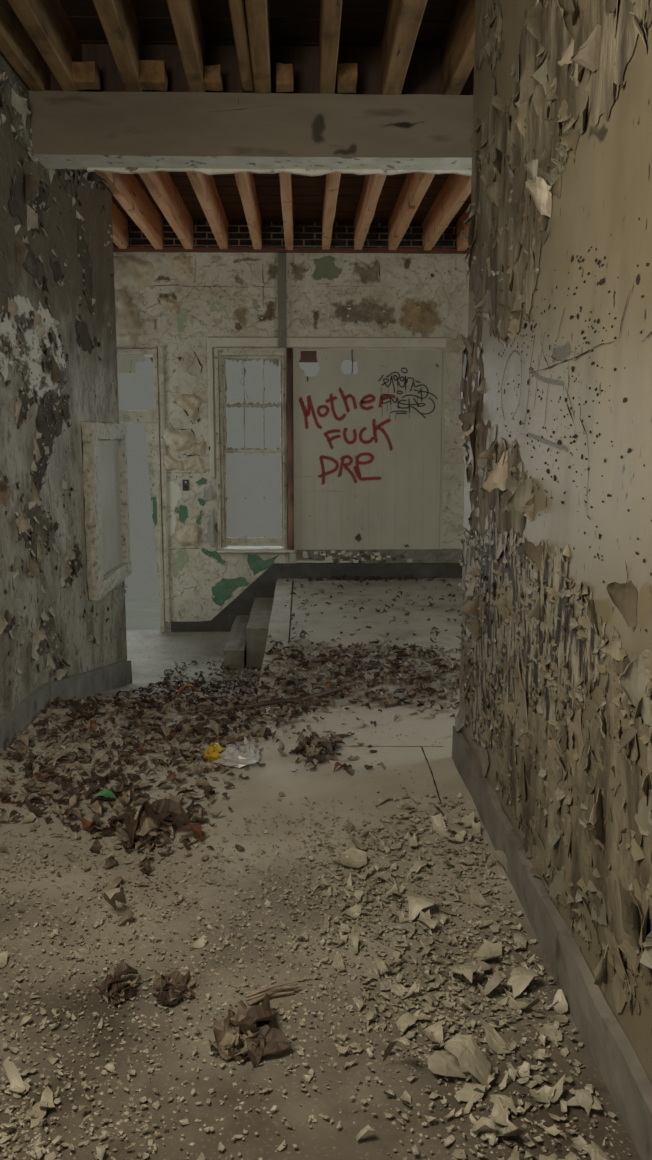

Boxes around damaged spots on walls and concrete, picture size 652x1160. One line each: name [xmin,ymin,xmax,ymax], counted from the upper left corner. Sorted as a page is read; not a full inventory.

peeling [0,70,127,683]
flaking render [154,481,186,538]
peeling [262,0,652,1016]